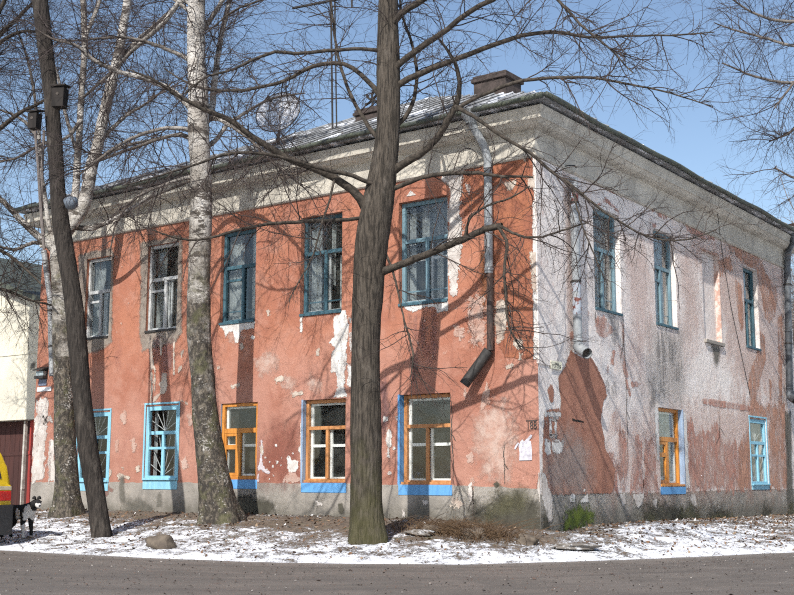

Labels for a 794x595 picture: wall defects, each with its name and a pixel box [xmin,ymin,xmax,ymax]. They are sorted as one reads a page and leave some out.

spalling [404,157,538,369]
peeling [149,338,184,403]
peeling [220,321,255,350]
peeling [329,310,352,398]
peeling [588,312,625,337]
peeling [607,350,639,396]
flaking render [683,225,788,508]
flaking render [31,397,55,484]
spalling [257,425,303,484]
peeling [543,384,564,455]
flaking render [608,407,660,509]
leakage [468,492,540,530]